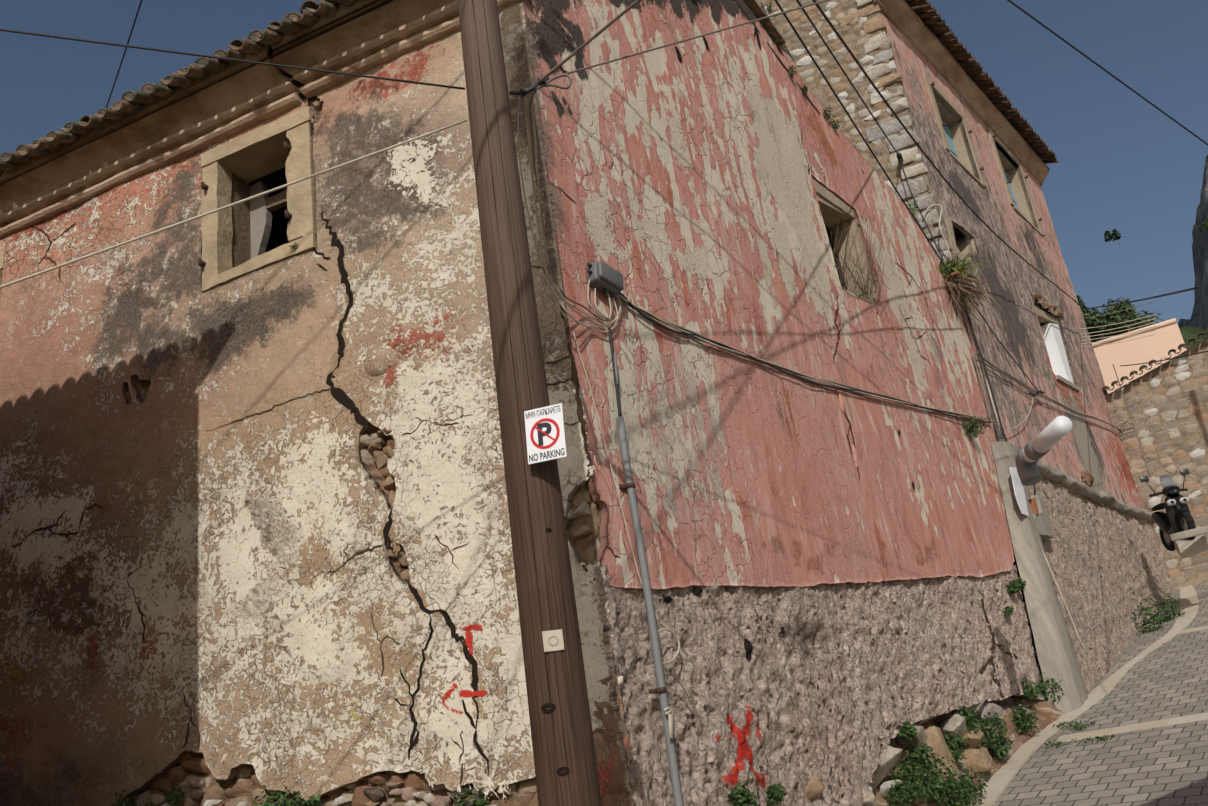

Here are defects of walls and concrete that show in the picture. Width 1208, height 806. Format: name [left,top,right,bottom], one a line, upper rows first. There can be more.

damp [93,151,317,386]
damp [311,88,445,253]
peeling [519,169,544,229]
damp [510,0,589,296]
damp [610,0,796,64]
peeling [738,88,832,317]
peeling [0,318,510,806]
crack [207,210,489,784]
crack [472,0,588,806]
peeling [548,377,623,703]
crack [833,293,860,481]
crack [978,590,1018,698]